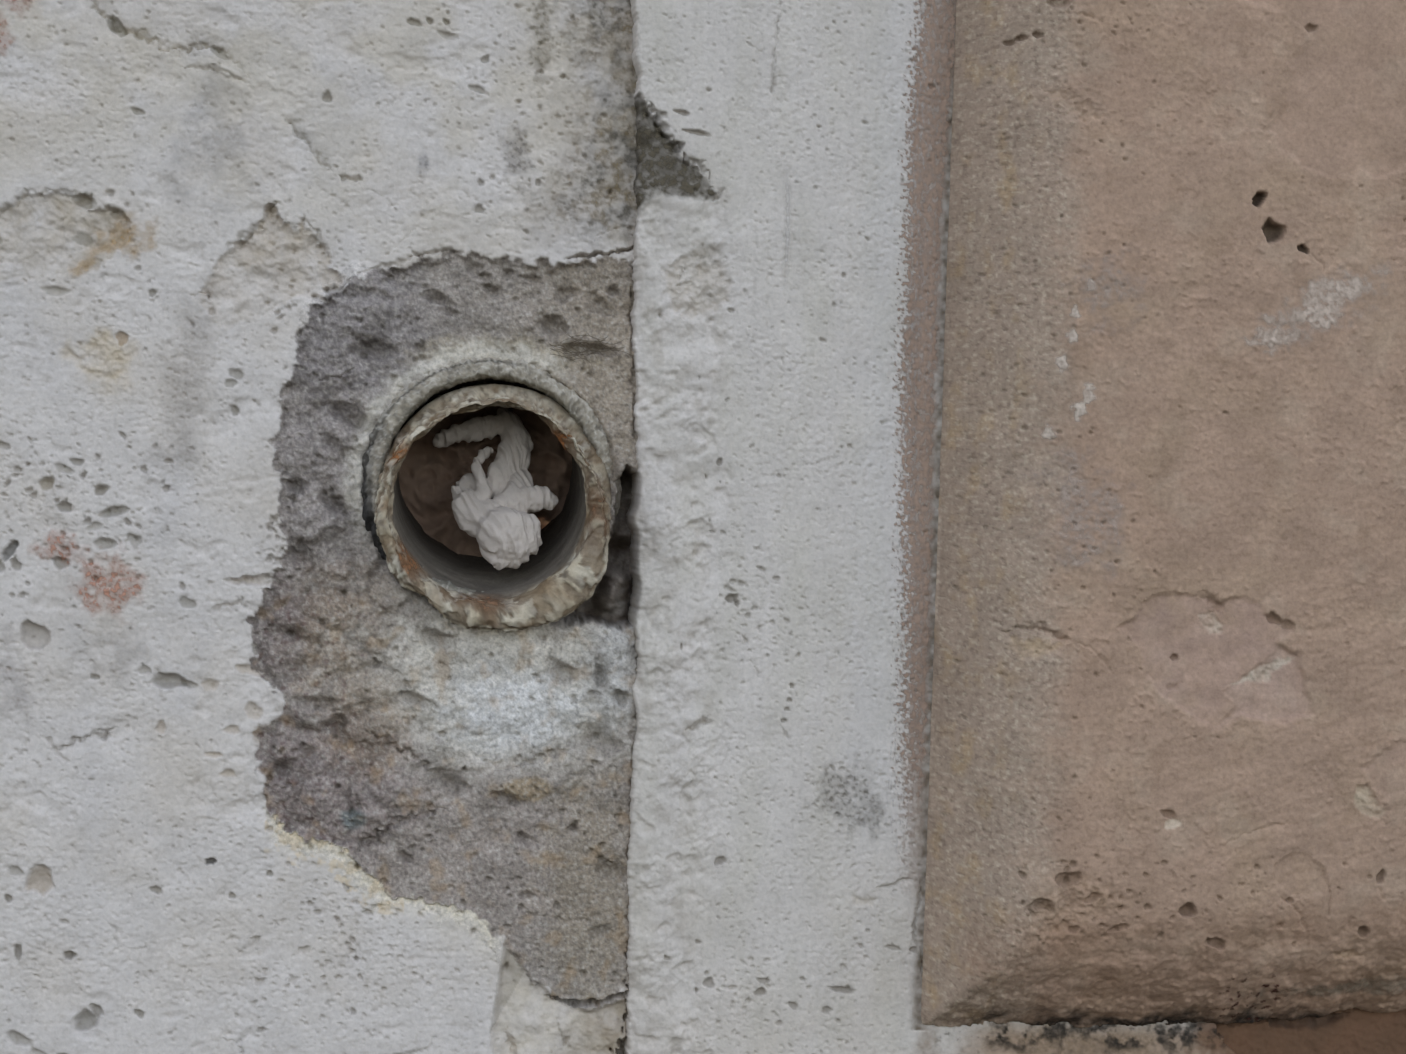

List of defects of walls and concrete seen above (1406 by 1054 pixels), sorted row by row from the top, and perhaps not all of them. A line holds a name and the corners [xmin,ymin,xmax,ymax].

crack [91,0,250,80]
spalling [633,93,721,208]
spalling [559,464,636,633]
peeling [1115,590,1319,734]
spalling [265,809,627,1054]